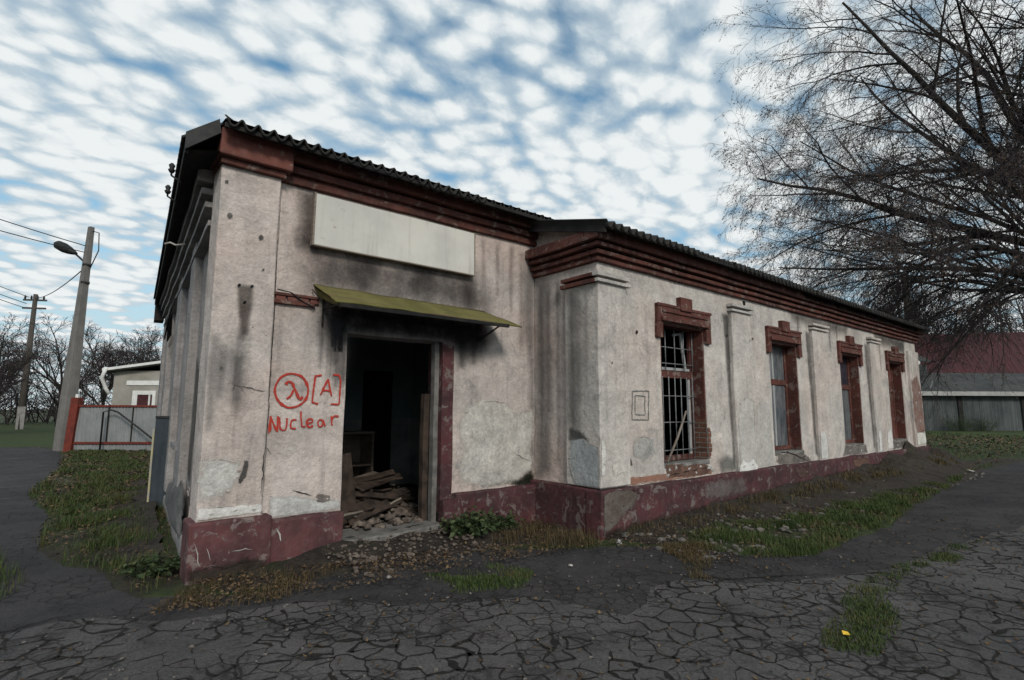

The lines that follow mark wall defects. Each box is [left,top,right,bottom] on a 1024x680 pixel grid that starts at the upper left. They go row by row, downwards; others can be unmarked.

water stain [239,286,251,332]
crack [233,190,282,490]
flaking render [843,375,926,468]
flaking render [196,457,339,521]
flaking render [569,419,715,536]